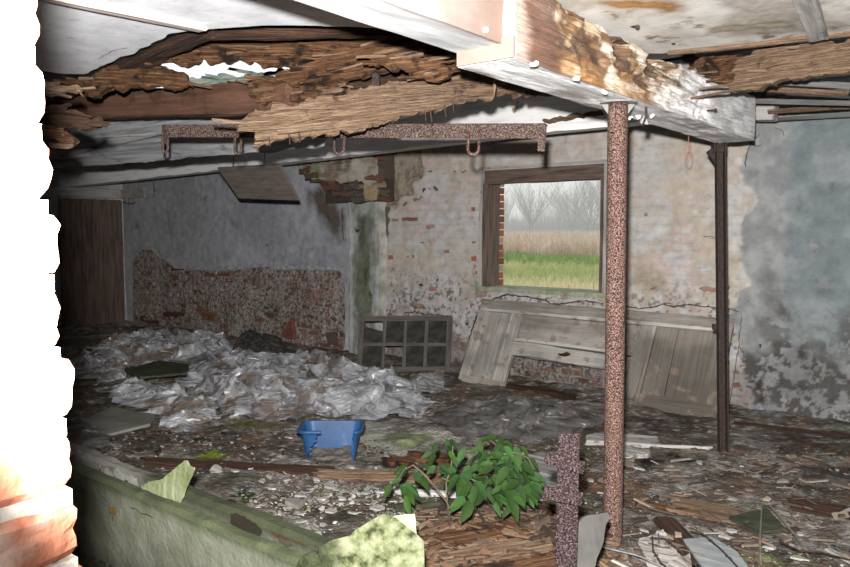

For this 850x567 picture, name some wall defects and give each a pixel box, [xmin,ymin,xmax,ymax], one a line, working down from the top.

spalling [299,153,395,204]
spalling [132,246,346,350]
crack [493,294,598,305]